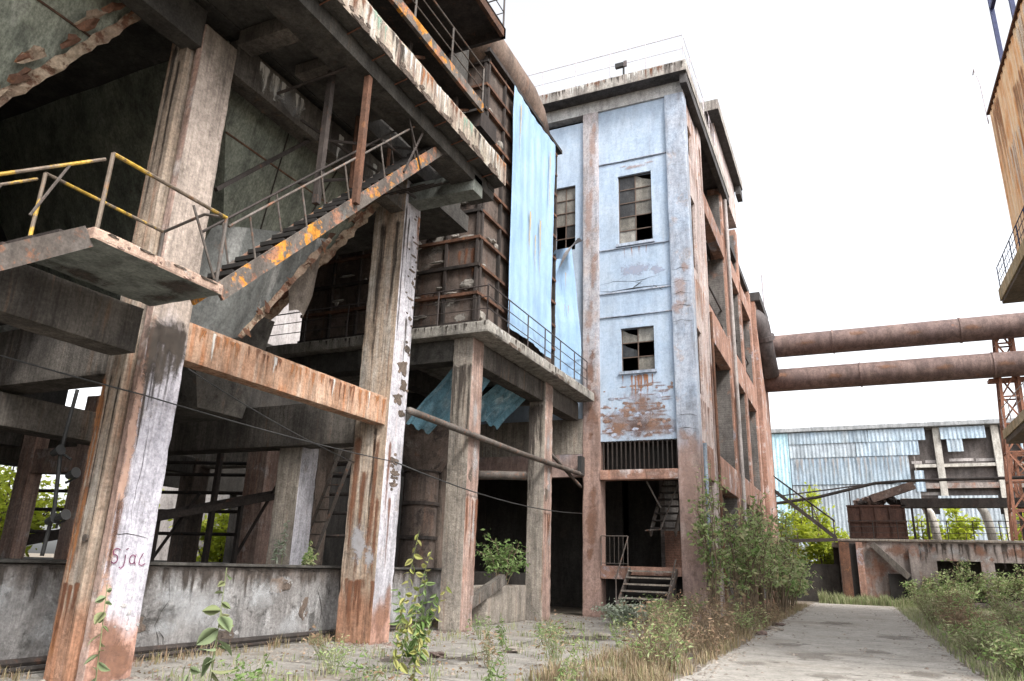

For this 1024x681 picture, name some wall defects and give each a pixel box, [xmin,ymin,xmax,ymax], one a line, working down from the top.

corrosion [348,204,370,223]
corrosion [256,277,295,315]
damp [136,320,186,446]
corrosion [199,327,385,417]
peeling [586,351,676,439]
corrosion [52,378,106,651]
corrosion [105,500,123,579]
corrosion [345,437,391,631]
corrosion [91,609,130,681]